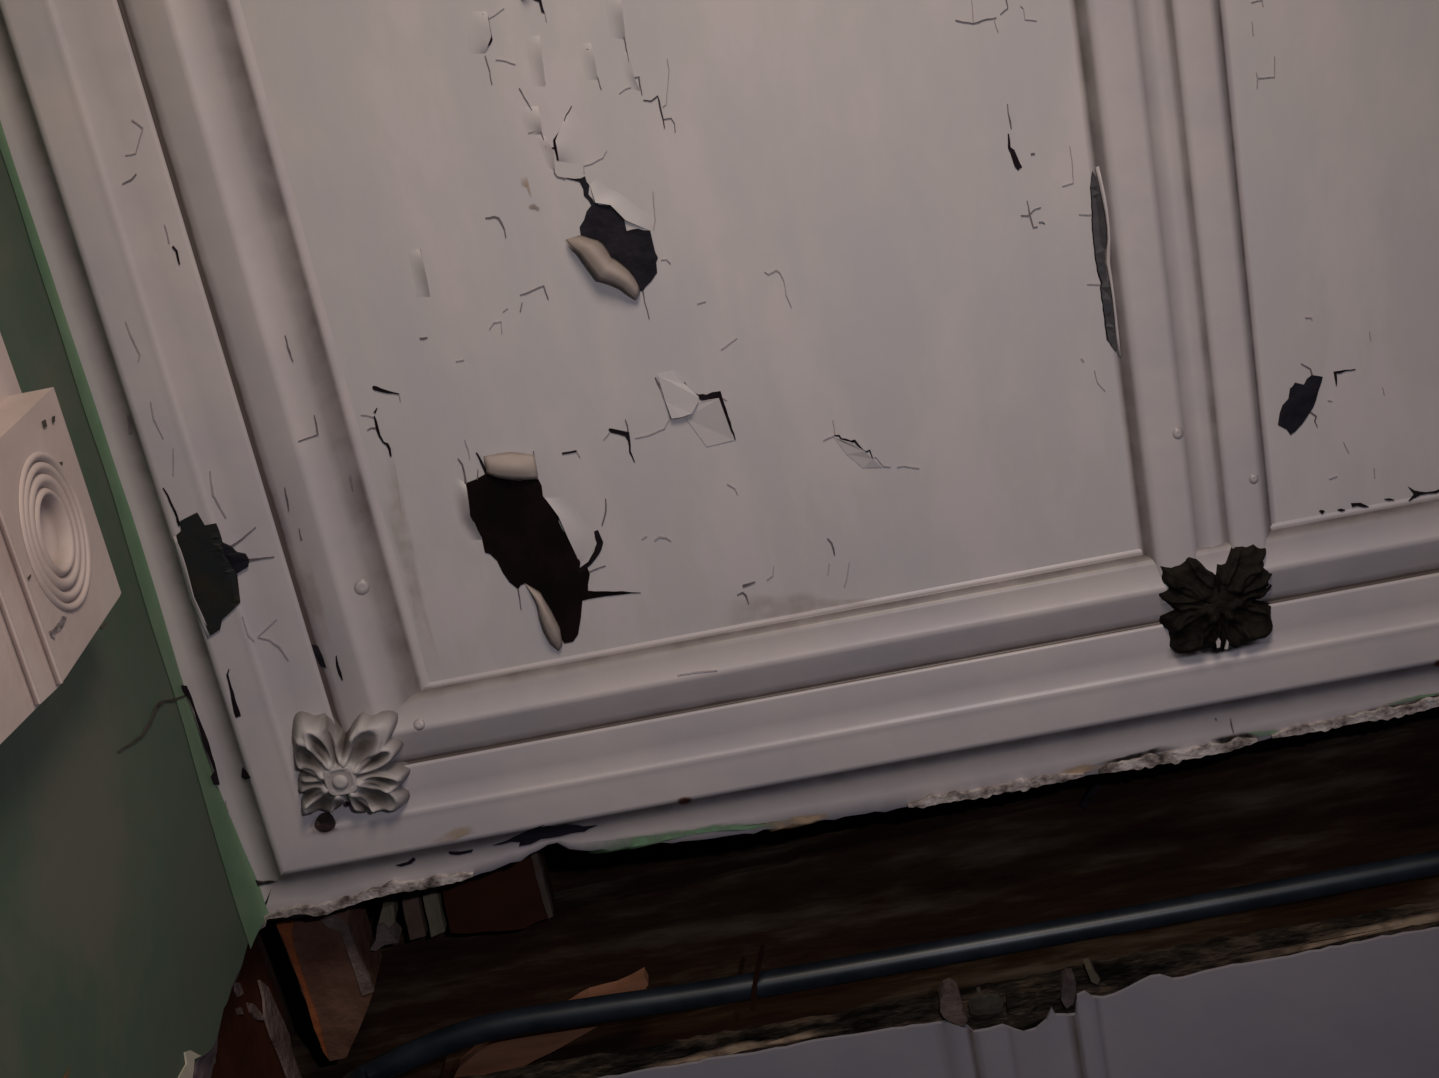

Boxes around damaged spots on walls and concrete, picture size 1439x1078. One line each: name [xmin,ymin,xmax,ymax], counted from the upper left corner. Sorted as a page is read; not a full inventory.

crack [467,0,676,173]
crack [1007,104,1074,228]
peeling [554,165,658,319]
peeling [1079,166,1121,356]
crack [361,386,401,457]
crack [562,372,736,462]
crack [823,420,919,469]
peeling [1278,363,1323,435]
crack [1328,331,1385,402]
peeling [163,488,274,638]
peeling [452,440,641,651]
peeling [495,824,597,846]